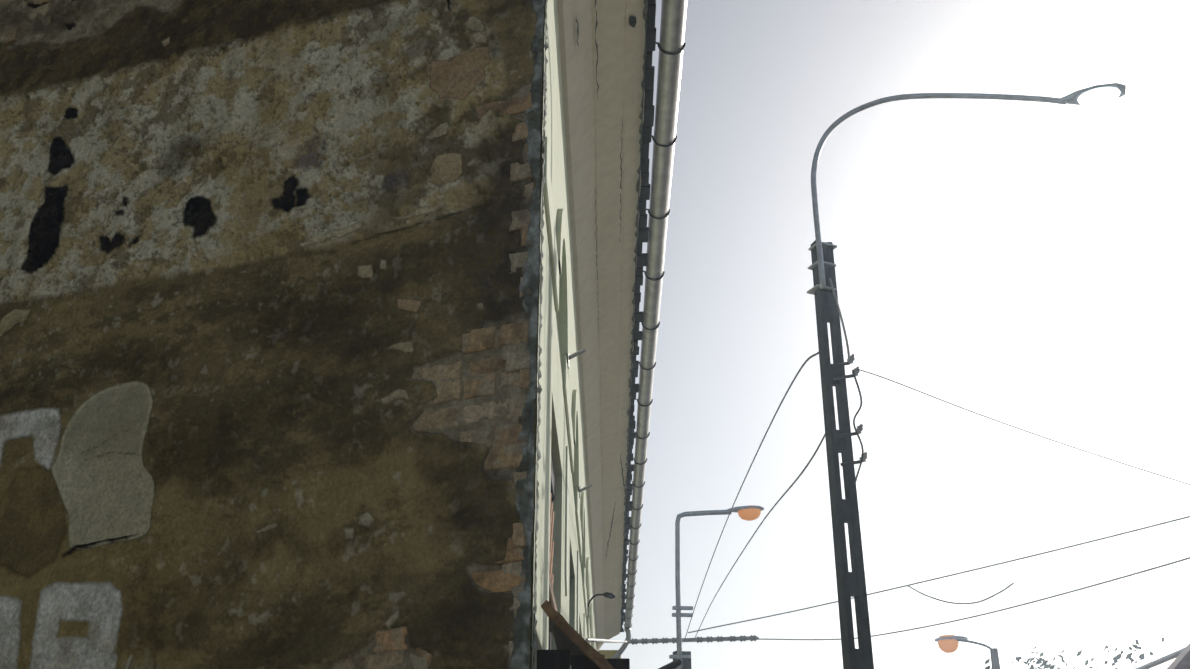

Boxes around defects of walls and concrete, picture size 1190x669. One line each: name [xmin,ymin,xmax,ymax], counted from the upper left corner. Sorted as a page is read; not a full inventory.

flaking render [357,260,386,278]
flaking render [380,0,548,669]
flaking render [344,512,374,539]
flaking render [331,610,433,669]